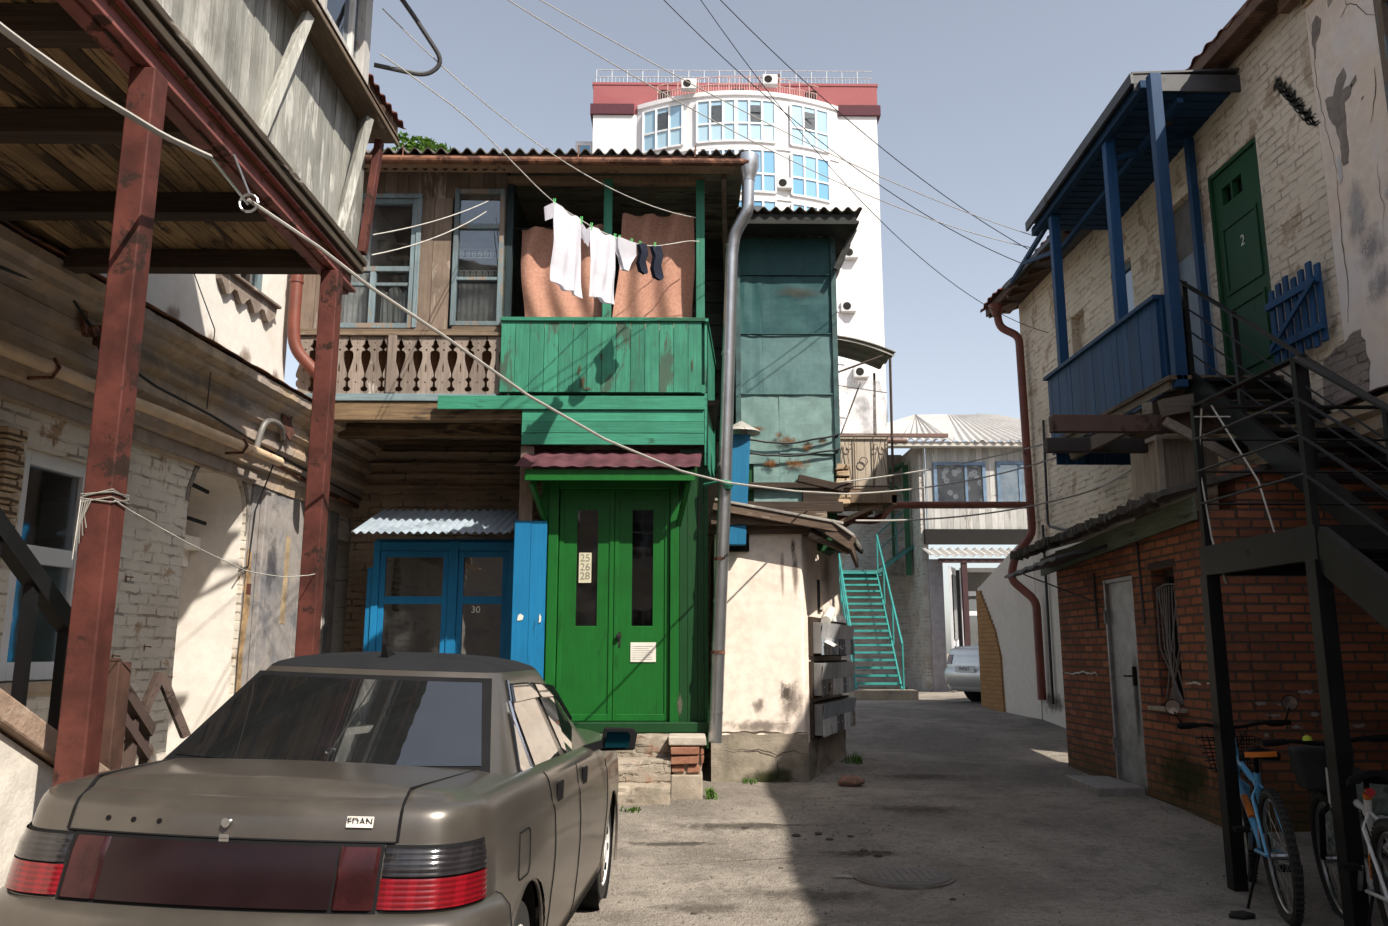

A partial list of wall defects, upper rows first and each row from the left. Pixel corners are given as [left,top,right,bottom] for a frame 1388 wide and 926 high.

crack [1307,0,1372,323]
peeling [1325,68,1357,184]
spalling [1323,329,1370,405]
water stain [741,683,798,731]